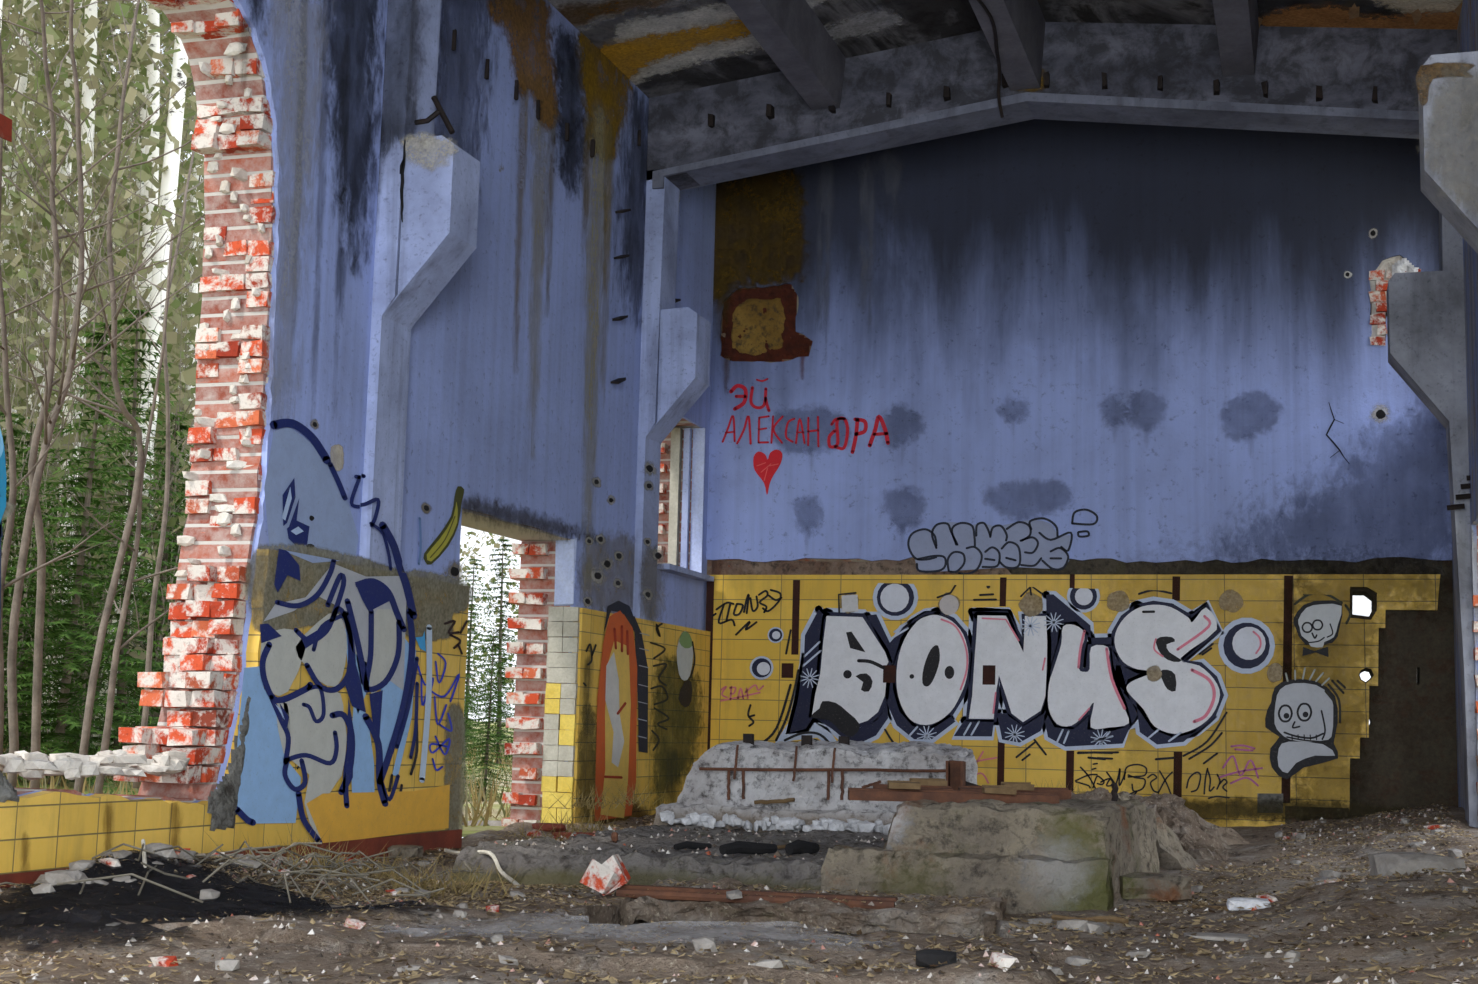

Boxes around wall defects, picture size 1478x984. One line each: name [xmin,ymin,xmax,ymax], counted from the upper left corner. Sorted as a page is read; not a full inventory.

damp [824,11,902,40]
peeling [1258,3,1463,30]
flaking render [0,114,12,142]
damp [283,0,310,290]
rust [488,0,751,455]
spalling [721,284,812,362]
crack [1326,402,1349,463]
spalling [207,696,251,831]